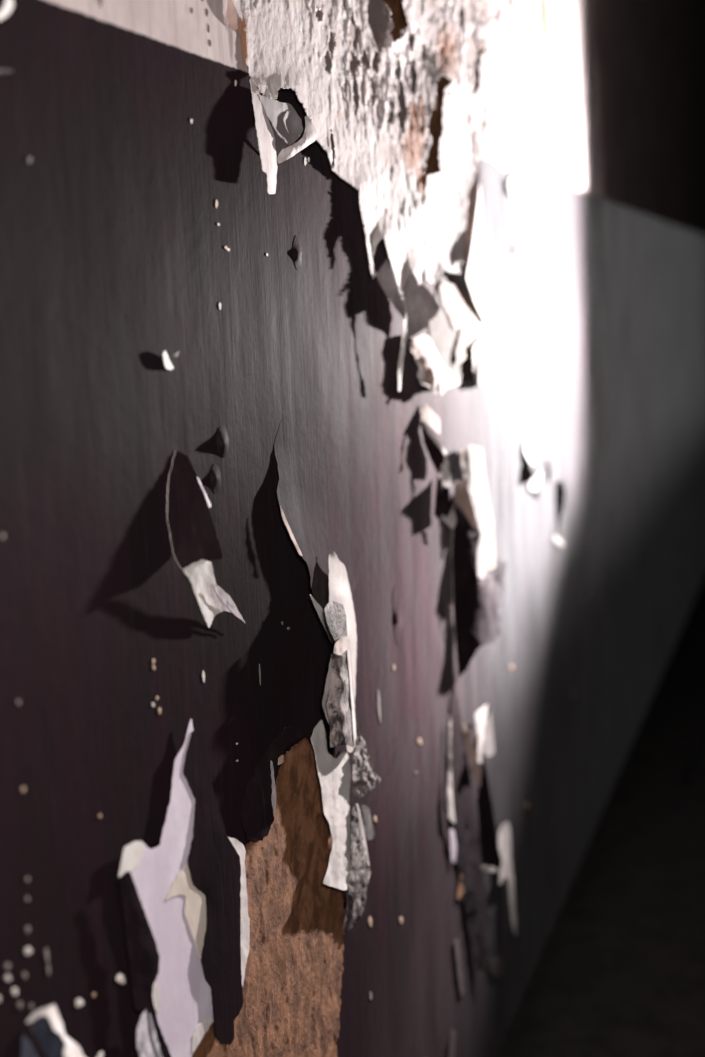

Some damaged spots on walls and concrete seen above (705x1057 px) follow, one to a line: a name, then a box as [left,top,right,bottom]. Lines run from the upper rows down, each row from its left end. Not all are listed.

peeling [226,0,603,392]
peeling [167,451,245,628]
peeling [420,422,507,607]
spalling [118,719,381,1057]